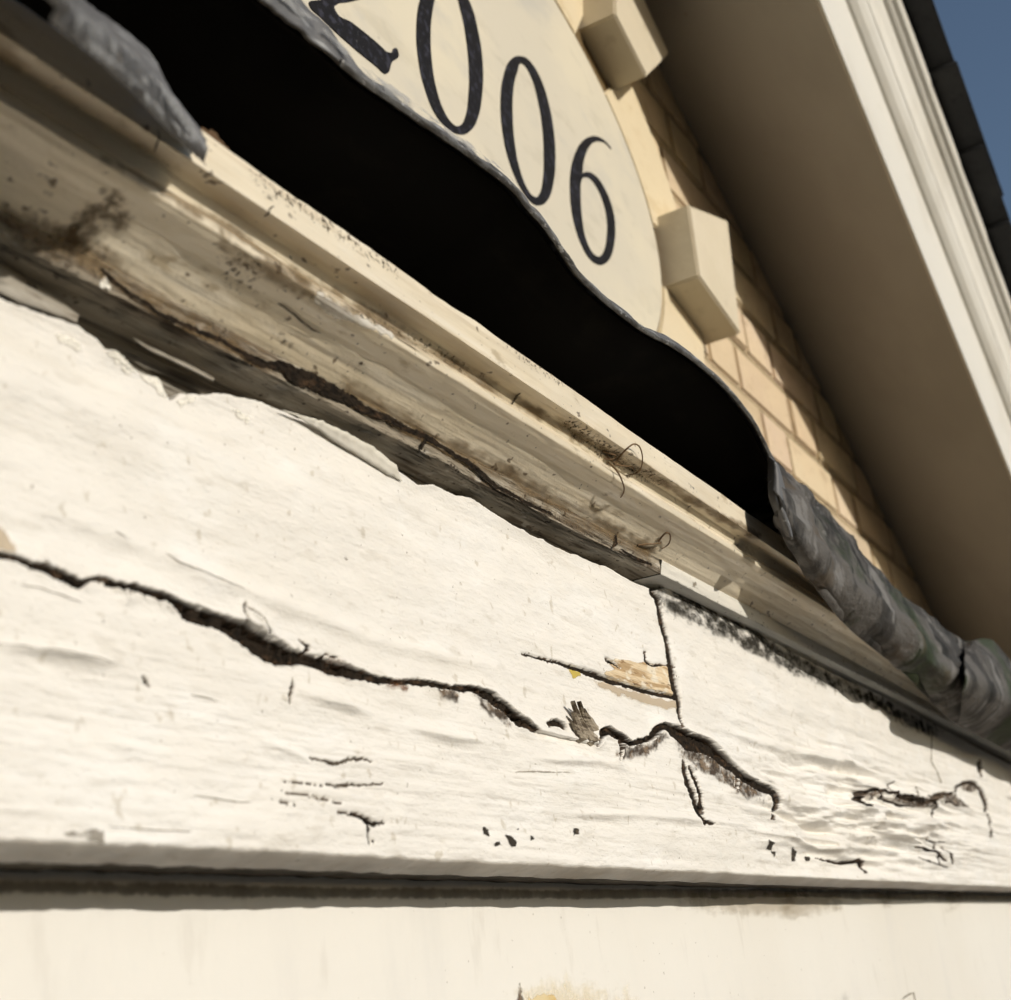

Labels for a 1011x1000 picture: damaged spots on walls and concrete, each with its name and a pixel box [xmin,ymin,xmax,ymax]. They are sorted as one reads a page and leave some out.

peeling [0,261,80,323]
water stain [262,262,314,298]
peeling [107,350,166,397]
peeling [282,409,402,481]
water stain [447,443,624,543]
water stain [633,541,654,557]
crack [0,554,559,729]
peeling [598,659,677,709]
crack [524,591,777,825]
water stain [658,582,938,736]
crack [279,757,380,843]
crack [852,735,991,834]